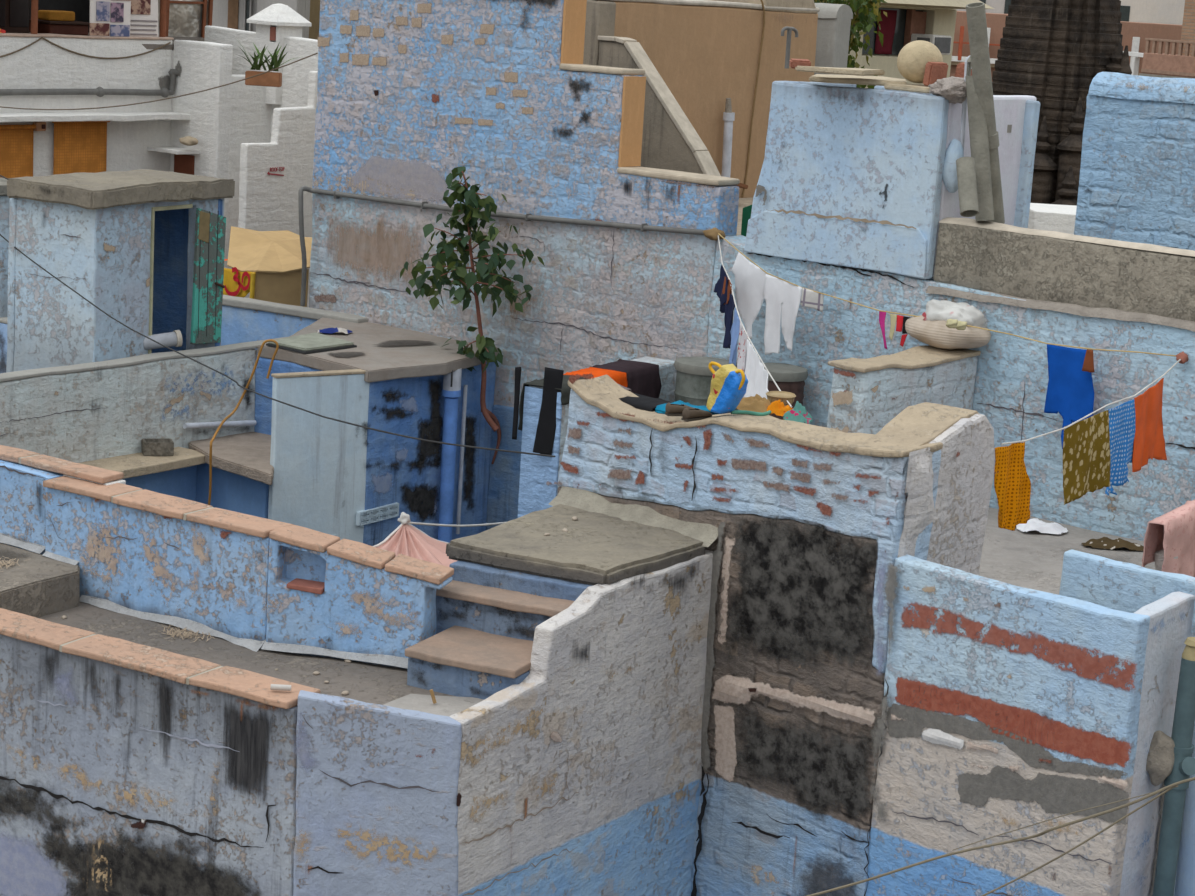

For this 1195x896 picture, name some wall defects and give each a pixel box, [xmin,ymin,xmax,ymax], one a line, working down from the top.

flaking render [318,3,432,66]
water stain [366,380,443,521]
flaking render [546,412,645,485]
flaking render [658,420,881,517]
water stain [726,518,878,666]
water stain [0,780,260,896]
crack [0,776,276,848]
water stain [224,706,269,797]
crack [691,767,709,896]
crack [878,679,889,765]
crack [732,811,1120,896]
flaking render [887,704,1129,825]